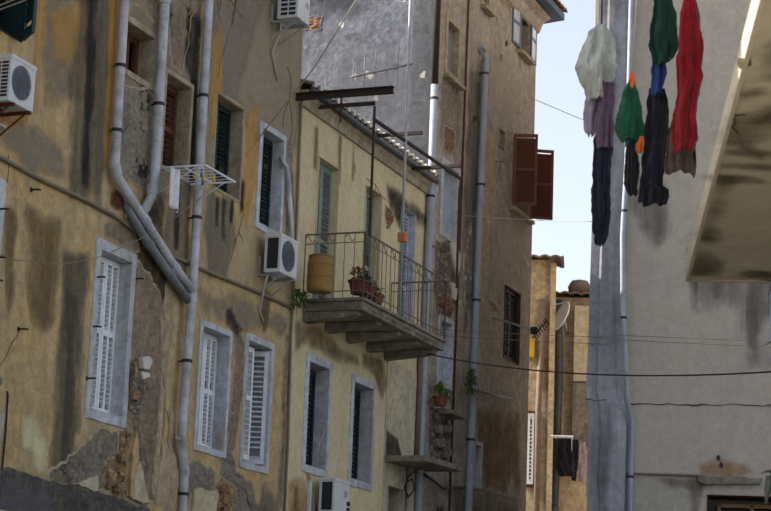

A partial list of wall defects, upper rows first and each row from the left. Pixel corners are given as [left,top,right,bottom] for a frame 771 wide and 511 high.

water stain [56,0,117,201]
rust [111,191,125,209]
peeling [130,0,324,231]
spalling [439,75,462,155]
spalling [432,115,497,329]
spalling [45,220,176,511]
spalling [187,296,290,511]
water stain [296,324,385,391]